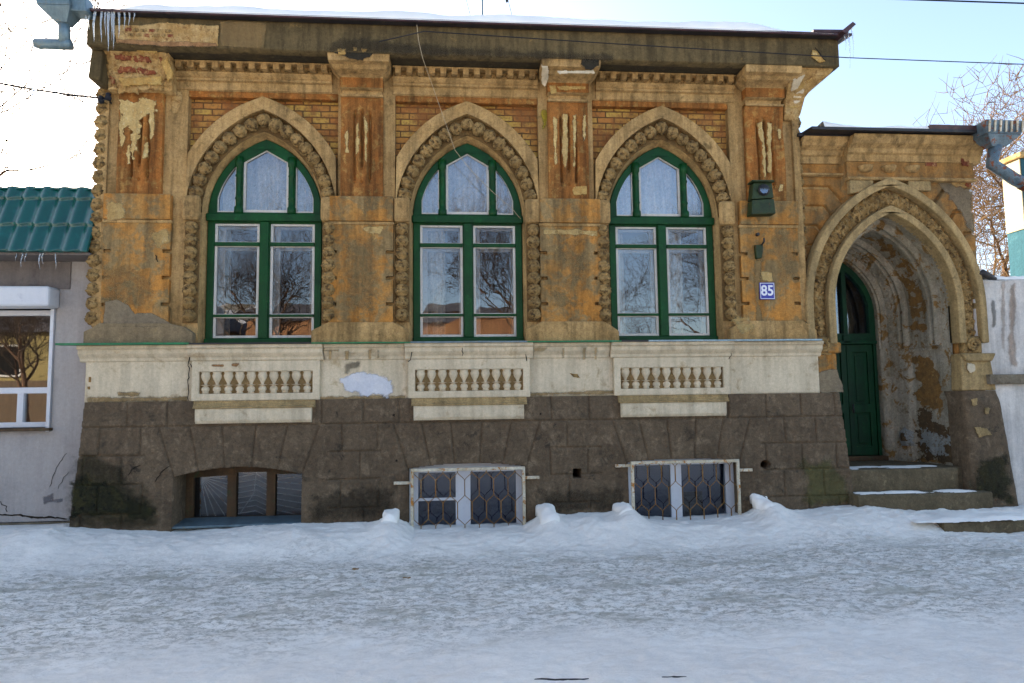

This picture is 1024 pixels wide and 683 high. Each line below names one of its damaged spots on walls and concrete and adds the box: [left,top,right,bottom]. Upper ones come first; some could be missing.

spalling [107,50,174,164]
peeling [345,117,368,162]
peeling [553,114,586,167]
peeling [757,122,781,177]
flaking render [909,355,952,465]
crack [0,501,67,520]